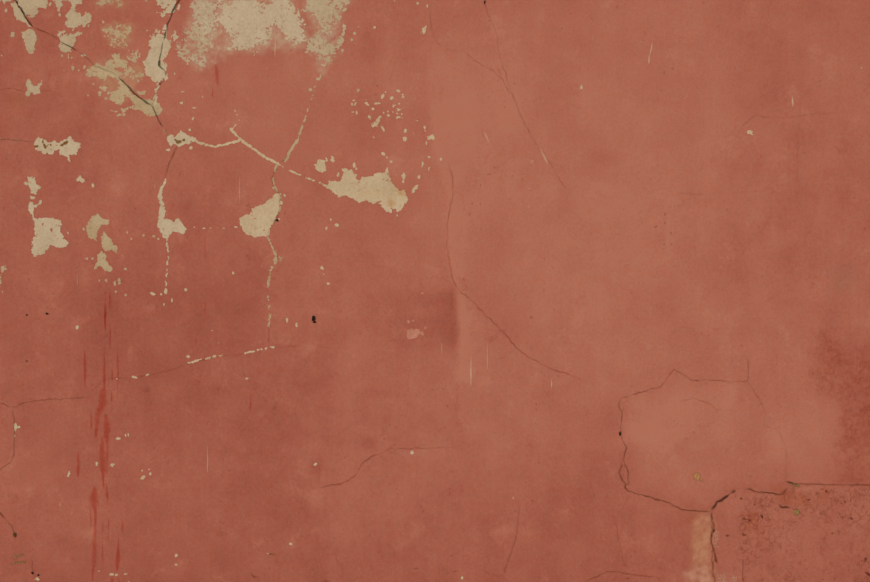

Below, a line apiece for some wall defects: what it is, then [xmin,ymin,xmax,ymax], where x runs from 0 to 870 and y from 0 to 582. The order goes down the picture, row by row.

peeling [0,0,359,117]
peeling [24,176,69,257]
peeling [34,136,81,162]
peeling [83,213,127,296]
peeling [126,178,205,305]
peeling [166,107,209,151]
peeling [223,186,286,238]
crack [196,73,327,192]
peeling [314,152,442,216]
peeling [351,89,435,145]
crack [244,237,283,354]
crack [186,330,223,364]